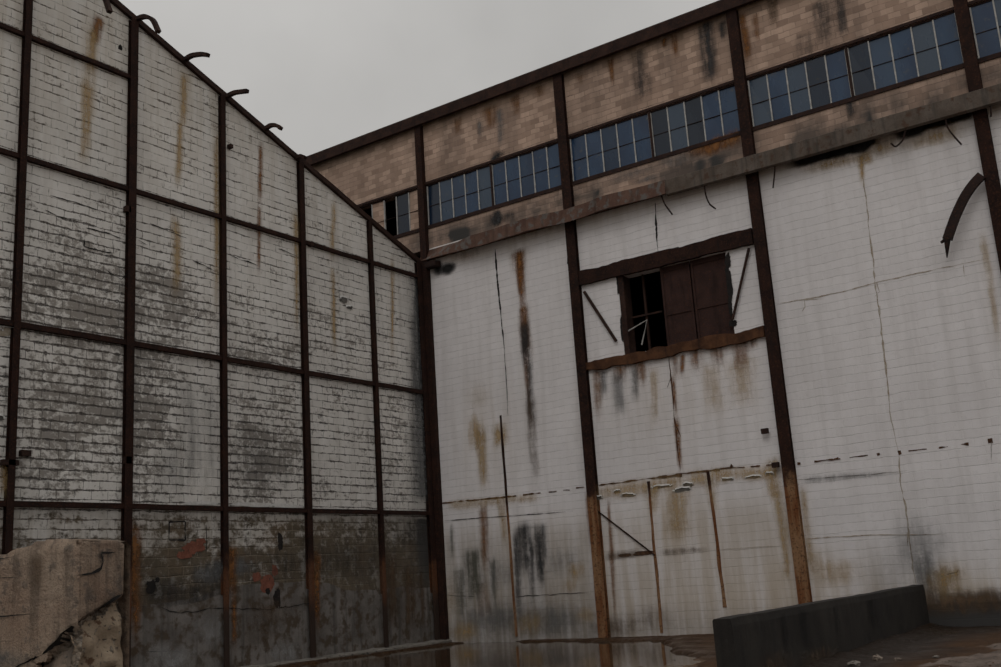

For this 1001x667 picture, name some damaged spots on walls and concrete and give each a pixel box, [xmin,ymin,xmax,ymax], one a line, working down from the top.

rust [88,17,103,69]
damp [699,22,726,78]
rust [177,77,187,173]
damp [521,325,532,414]
crack [775,157,988,583]
damp [460,552,479,602]
damp [514,525,545,596]